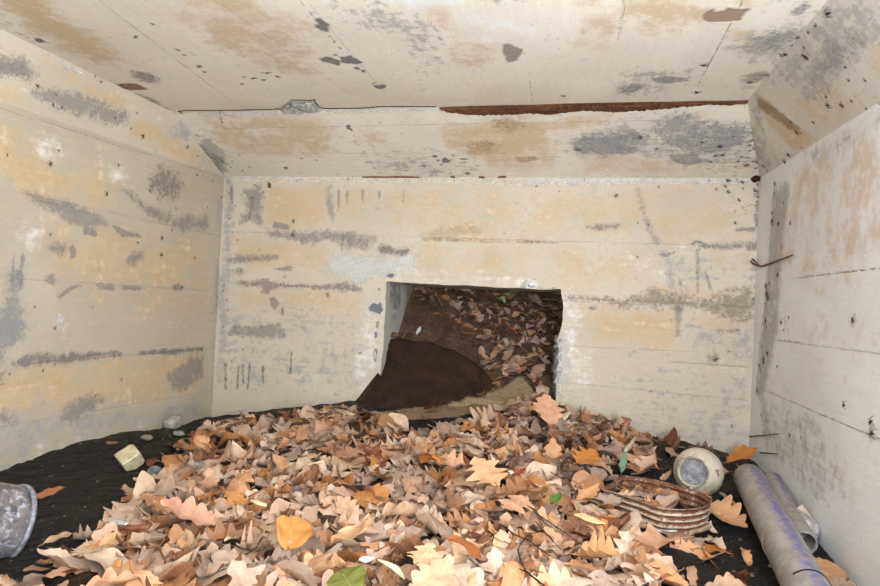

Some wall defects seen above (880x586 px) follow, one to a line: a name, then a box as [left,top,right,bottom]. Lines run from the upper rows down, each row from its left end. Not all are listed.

peeling [701,6,753,23]
water stain [0,54,33,80]
spalling [281,102,319,114]
water stain [574,114,748,165]